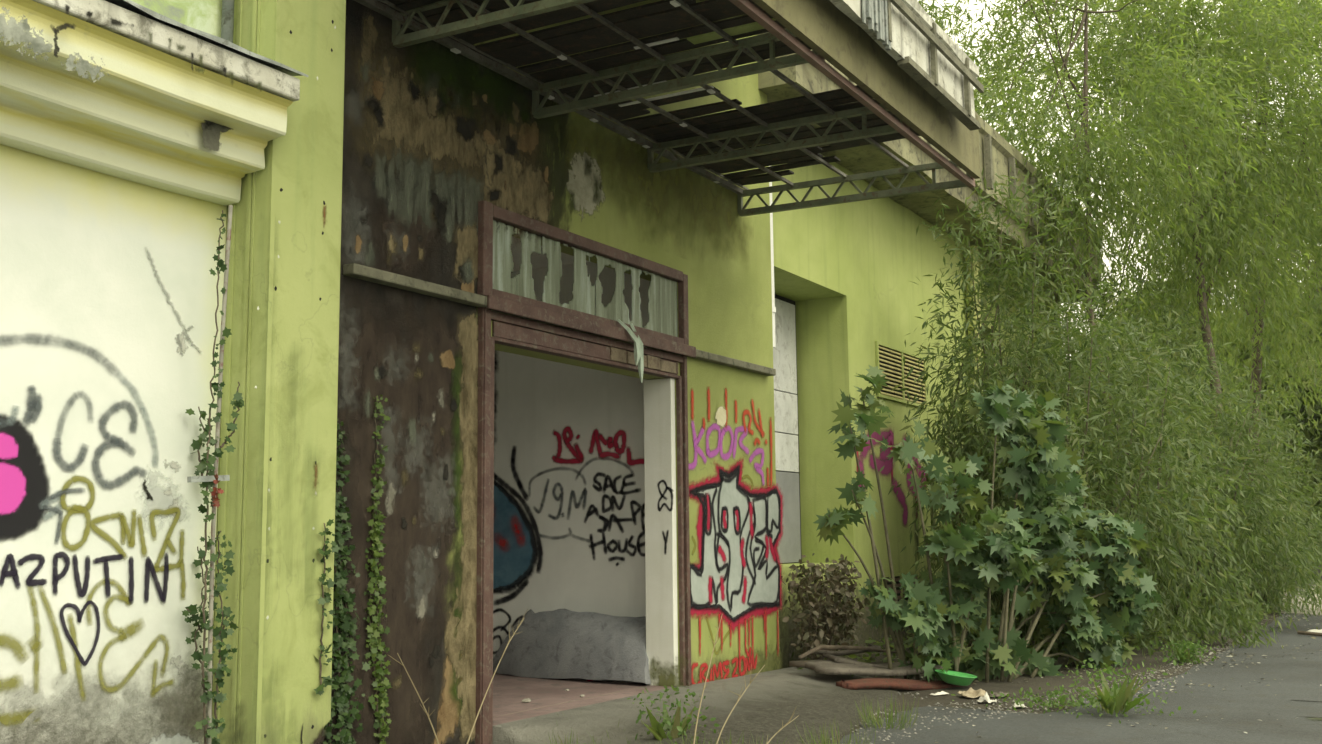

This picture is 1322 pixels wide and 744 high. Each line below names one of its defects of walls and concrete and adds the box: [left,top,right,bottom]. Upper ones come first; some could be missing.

peeling [350,13,606,293]
peeling [385,471,415,529]
peeling [414,313,478,744]
spalling [0,656,213,744]